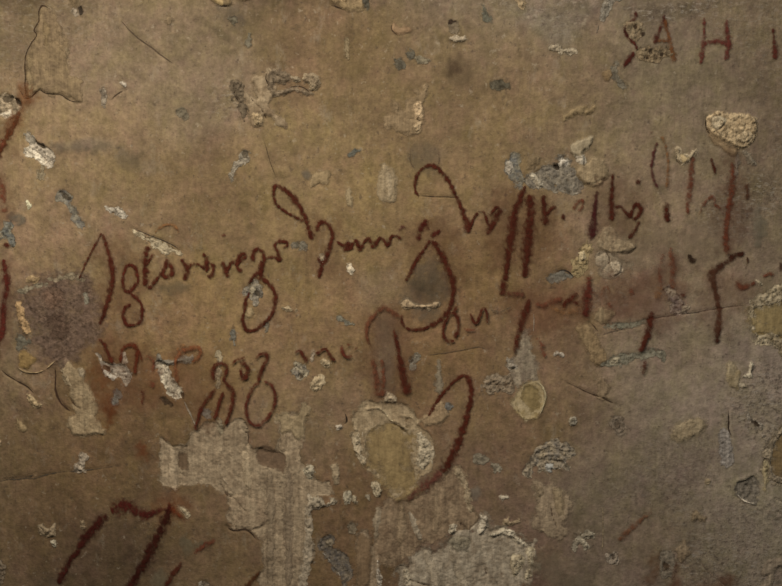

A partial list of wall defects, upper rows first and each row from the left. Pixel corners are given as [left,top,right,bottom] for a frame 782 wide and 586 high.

spalling [0,92,22,119]
peeling [229,67,321,129]
spalling [23,133,55,180]
spalling [504,135,610,196]
spalling [705,110,757,178]
spalling [747,280,782,356]
spalling [480,314,547,421]
flaking render [154,350,596,586]
spalling [734,412,782,505]